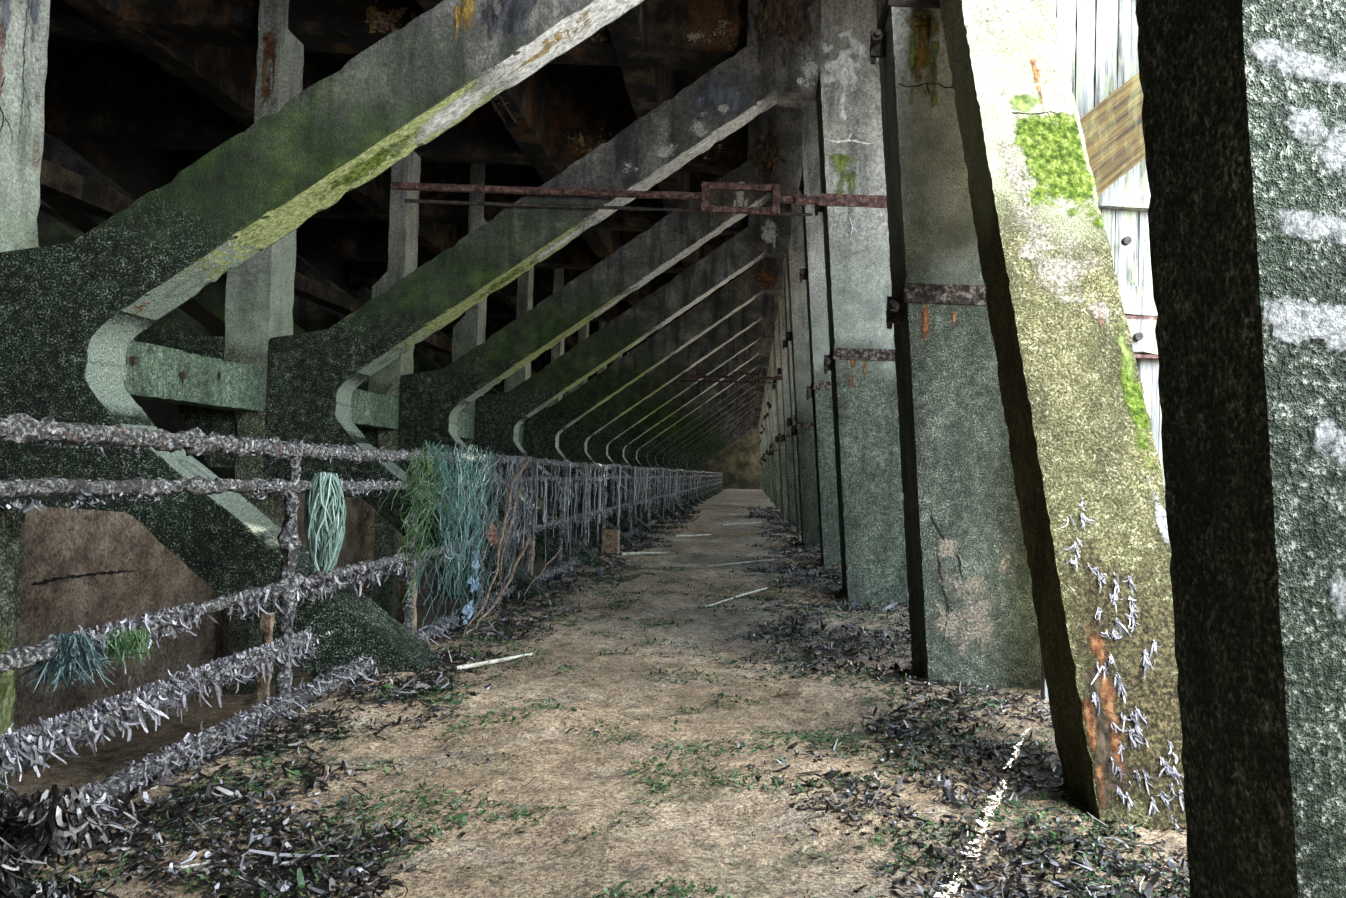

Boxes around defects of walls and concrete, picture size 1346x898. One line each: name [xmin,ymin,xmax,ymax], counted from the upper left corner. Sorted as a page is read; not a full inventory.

rust [921,305,930,339]
crack [930,515,963,640]
rust [1081,612,1132,810]